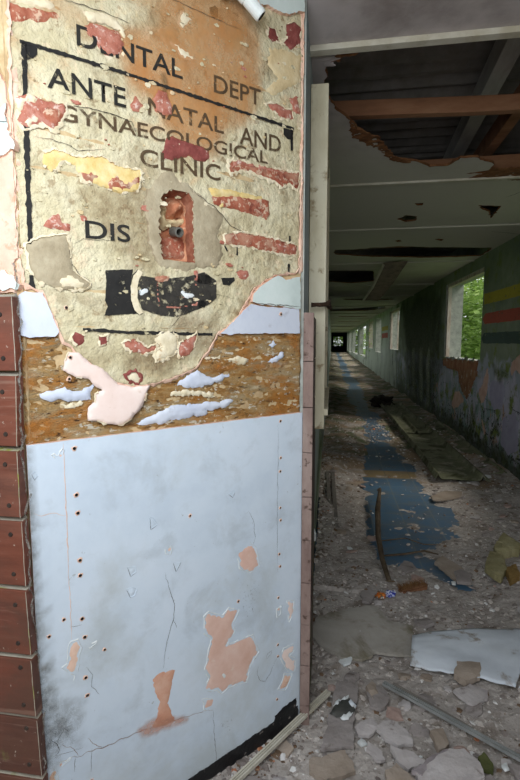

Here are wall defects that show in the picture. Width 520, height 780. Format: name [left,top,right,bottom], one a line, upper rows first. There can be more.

spalling [0,0,305,426]
spalling [442,356,489,434]
peeling [237,543,260,573]
peeling [62,635,107,681]
peeling [145,670,183,734]
peeling [202,600,259,709]
peeling [274,643,297,734]
crack [52,728,151,771]